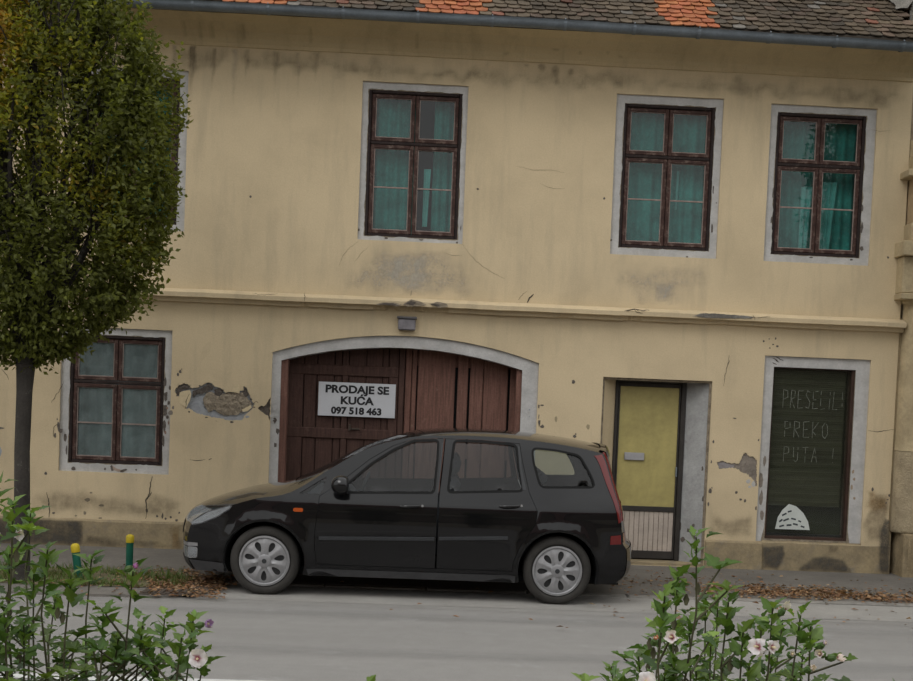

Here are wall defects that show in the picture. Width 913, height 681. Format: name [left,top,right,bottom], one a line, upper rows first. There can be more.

flaking render [162,369,280,458]
flaking render [702,453,766,520]